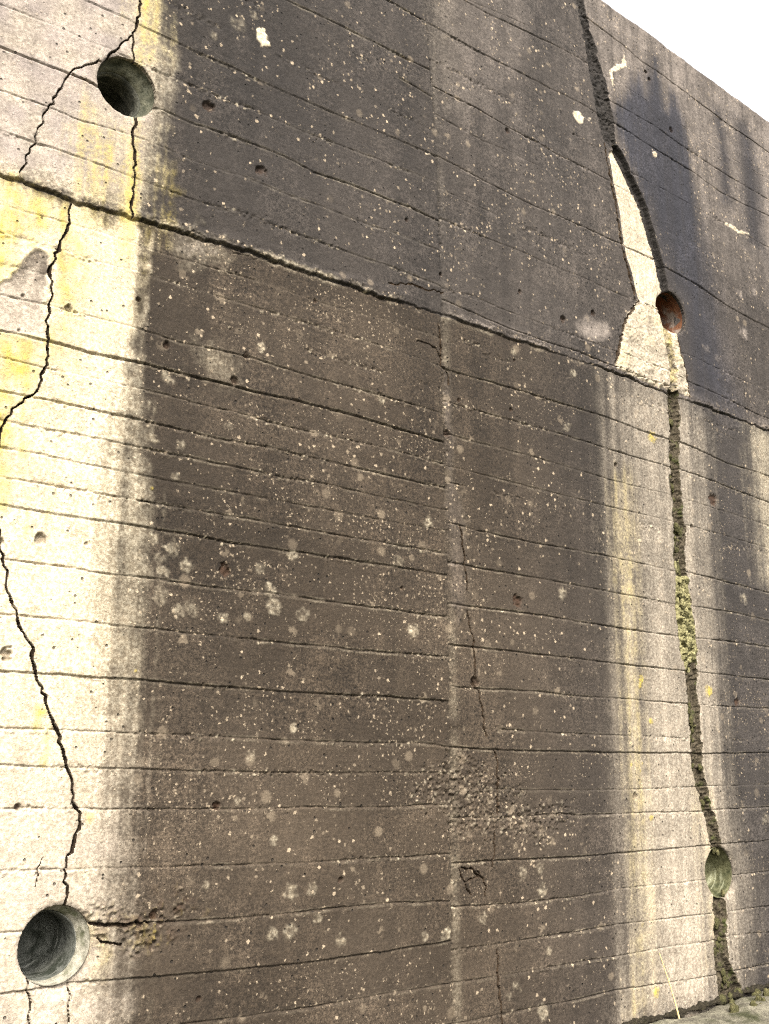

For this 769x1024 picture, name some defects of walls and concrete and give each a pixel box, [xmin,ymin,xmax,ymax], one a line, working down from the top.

crack [19,0,142,177]
crack [129,117,138,219]
damp [413,0,557,137]
spalling [608,150,662,307]
crack [0,203,72,447]
crack [576,0,722,857]
damp [572,45,769,1024]
crack [0,529,82,906]
crack [458,525,500,867]
crack [24,980,32,1024]
crack [88,919,149,947]
crack [709,887,769,1013]